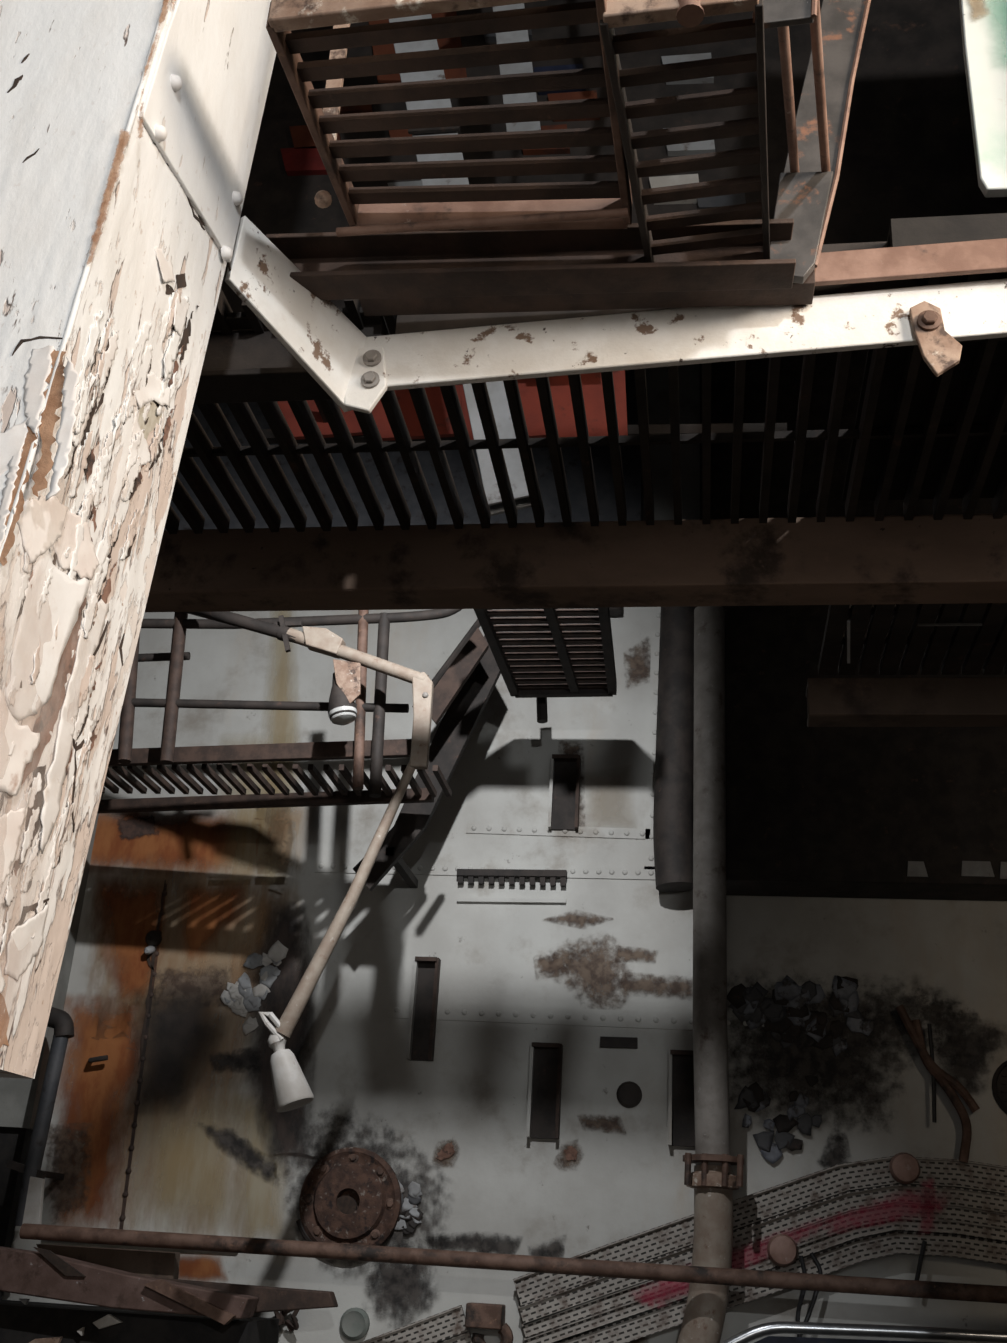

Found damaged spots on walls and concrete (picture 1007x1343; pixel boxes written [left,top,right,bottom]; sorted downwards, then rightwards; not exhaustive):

corrosion [87,0,176,264]
peeling [0,247,199,1048]
corrosion [47,810,302,1222]
corrosion [545,913,605,928]